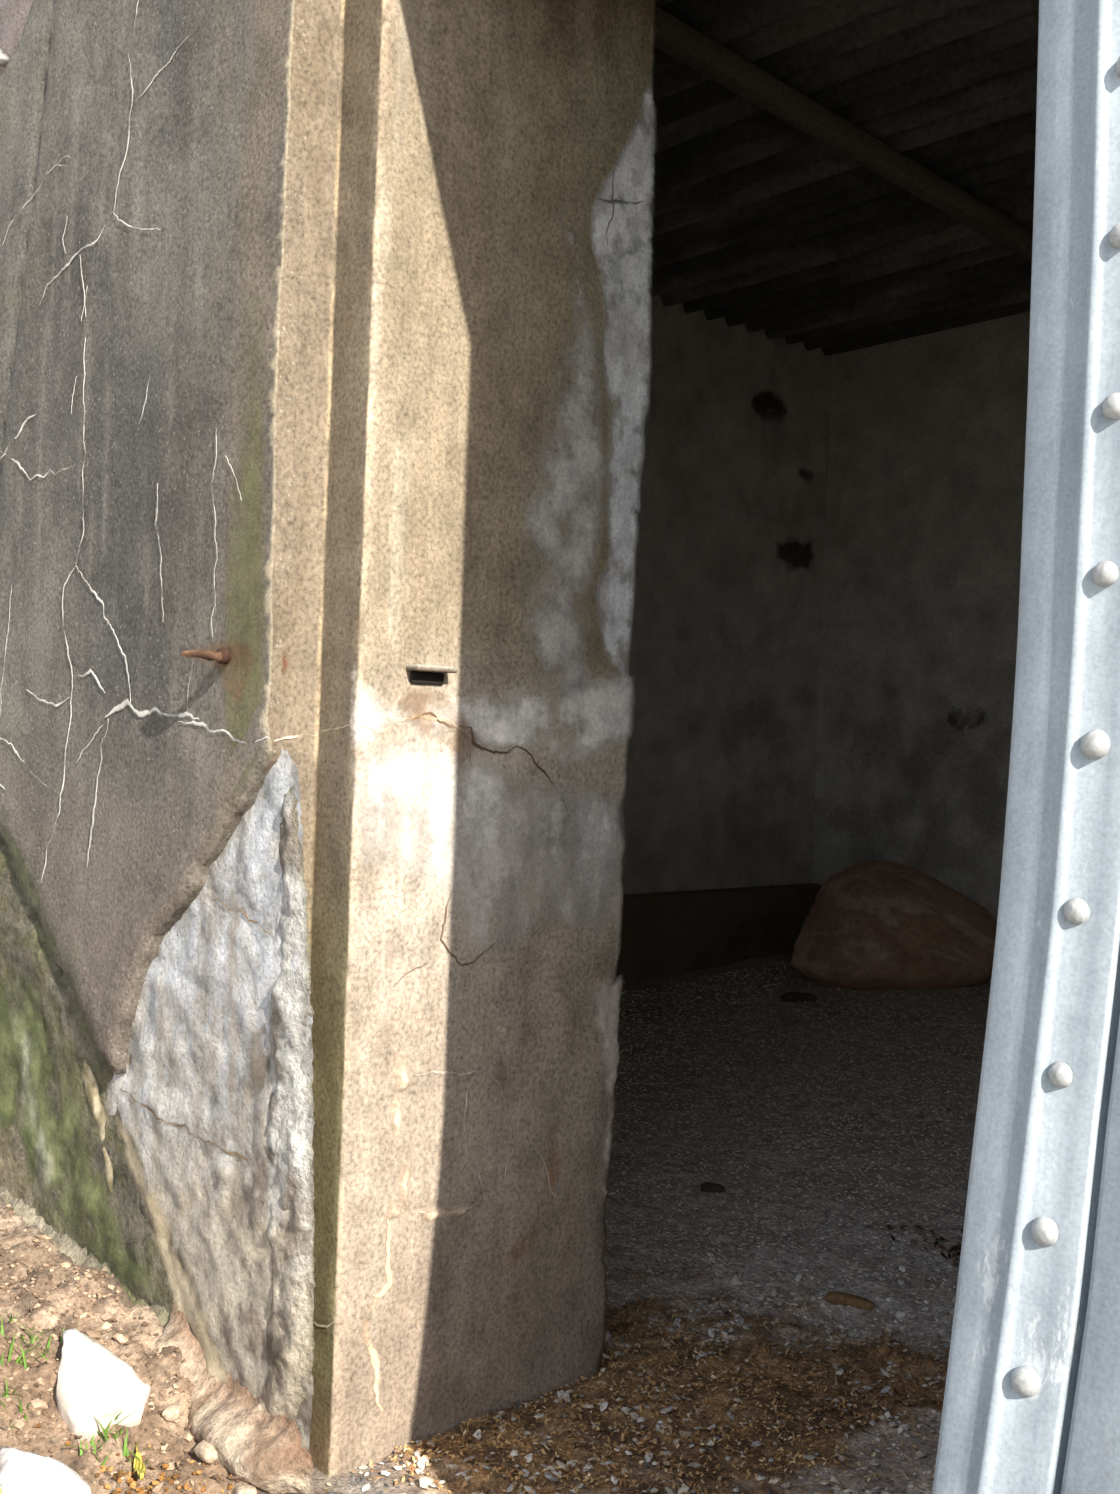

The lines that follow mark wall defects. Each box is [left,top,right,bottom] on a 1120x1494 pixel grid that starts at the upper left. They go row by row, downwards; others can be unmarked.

crack [1,34,190,480]
crack [0,518,297,881]
crack [211,439,241,637]
crack [393,838,498,987]
crack [355,712,574,842]
spalling [0,748,316,1451]